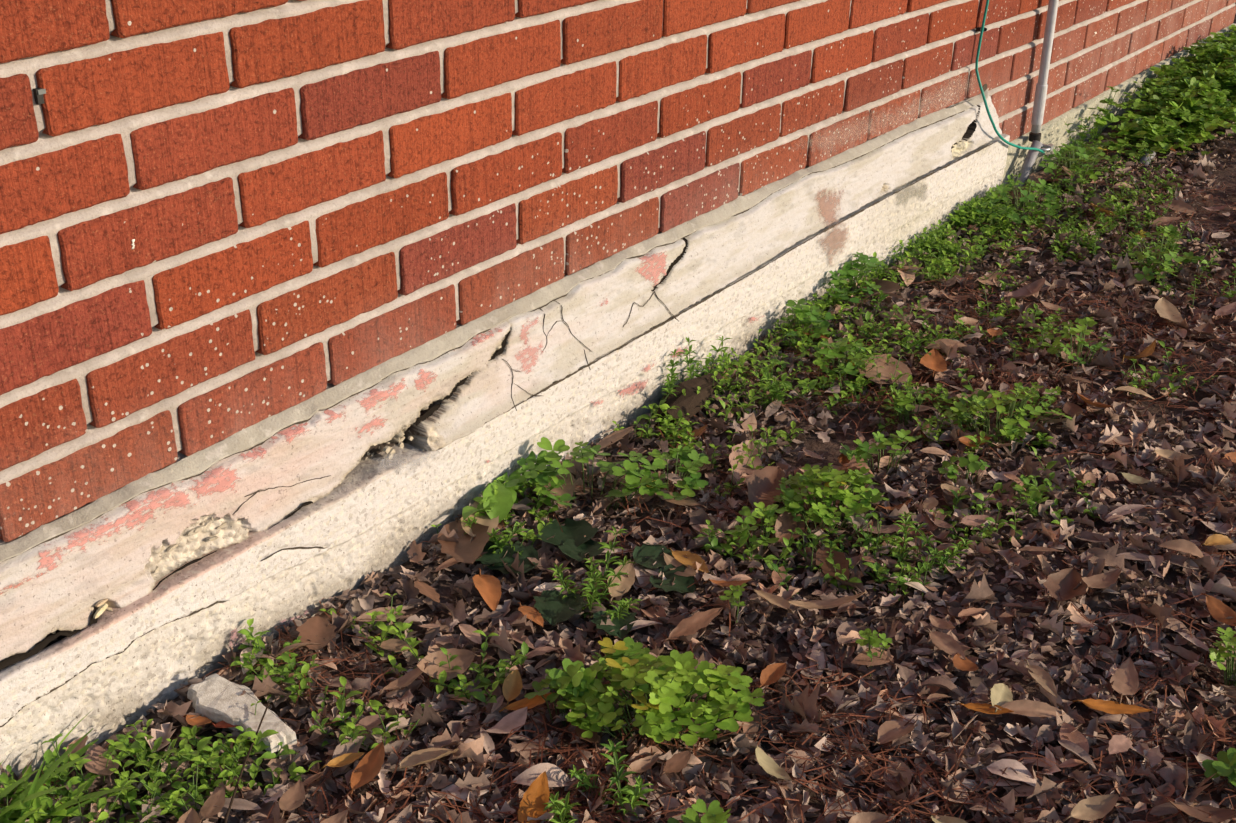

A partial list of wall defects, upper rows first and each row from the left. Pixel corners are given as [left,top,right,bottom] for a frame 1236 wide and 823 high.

spalling [951,139,975,160]
crack [7,99,997,561]
peeling [356,369,438,438]
spalling [1,423,313,594]
spalling [93,598,123,619]